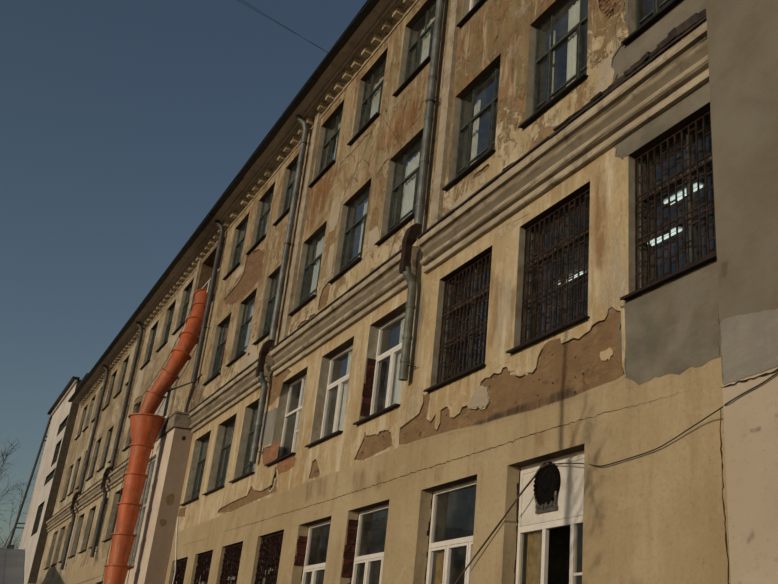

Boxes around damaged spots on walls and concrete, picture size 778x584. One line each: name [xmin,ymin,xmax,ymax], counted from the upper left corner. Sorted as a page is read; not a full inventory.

flaking render [595,56,615,94]
flaking render [224,247,266,307]
flaking render [354,303,626,464]
flaking render [217,439,297,516]